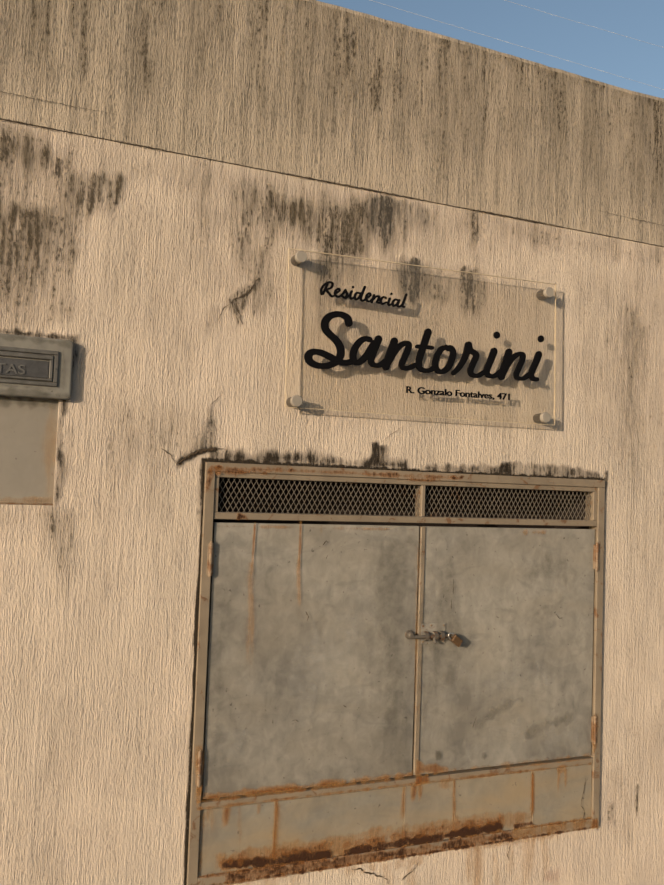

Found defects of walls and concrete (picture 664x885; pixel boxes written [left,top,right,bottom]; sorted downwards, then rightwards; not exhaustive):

water stain [333,11,356,94]
water stain [346,45,408,112]
water stain [609,98,662,194]
water stain [0,126,123,367]
water stain [234,180,411,282]
crack [218,277,258,326]
water stain [229,264,264,323]
water stain [397,258,443,304]
water stain [456,266,485,314]
corrosion [197,762,598,885]
crack [352,861,416,880]